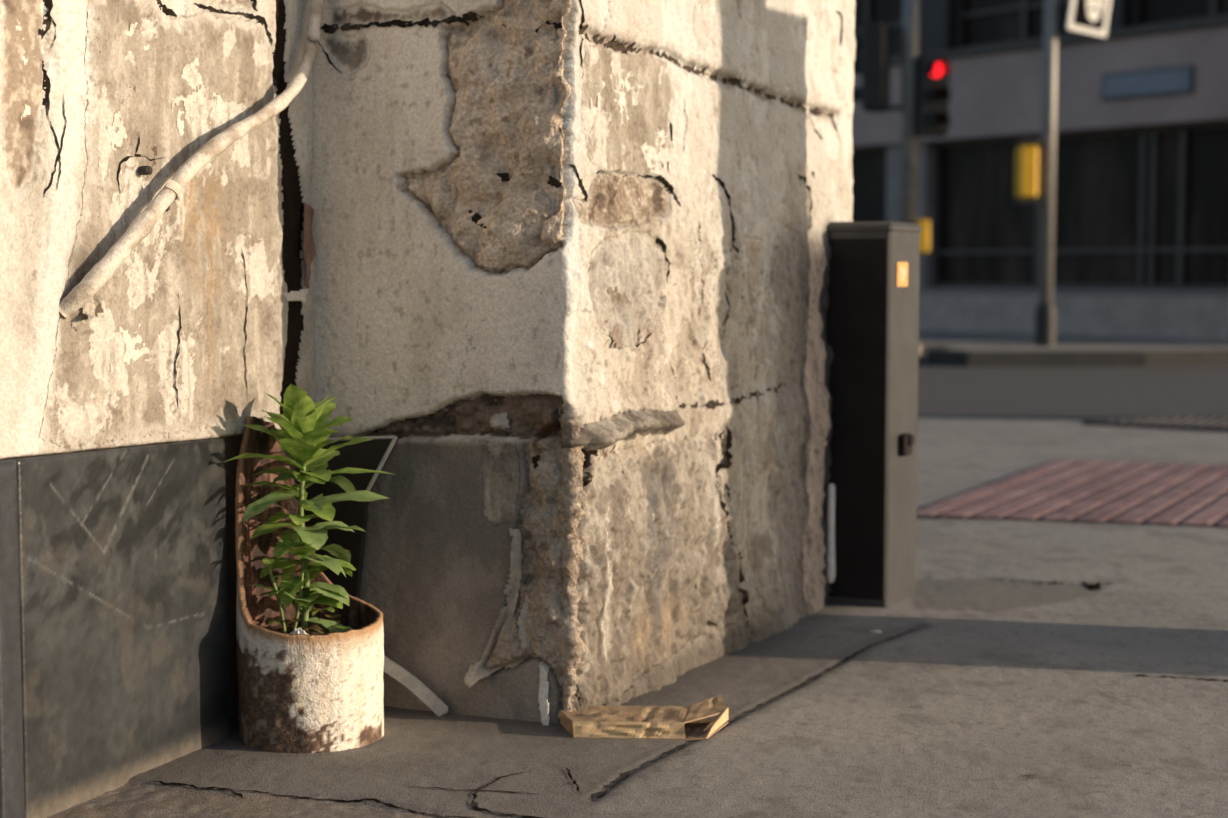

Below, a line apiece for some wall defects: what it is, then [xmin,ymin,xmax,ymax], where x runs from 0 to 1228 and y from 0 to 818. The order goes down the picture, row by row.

crack [38,0,67,198]
crack [117,133,165,195]
crack [156,0,316,414]
crack [318,11,484,73]
spalling [321,0,682,350]
crack [570,164,588,201]
crack [579,0,843,149]
crack [797,171,815,230]
crack [670,175,785,628]
spalling [363,390,743,726]
crack [153,771,542,818]
crack [565,740,694,800]